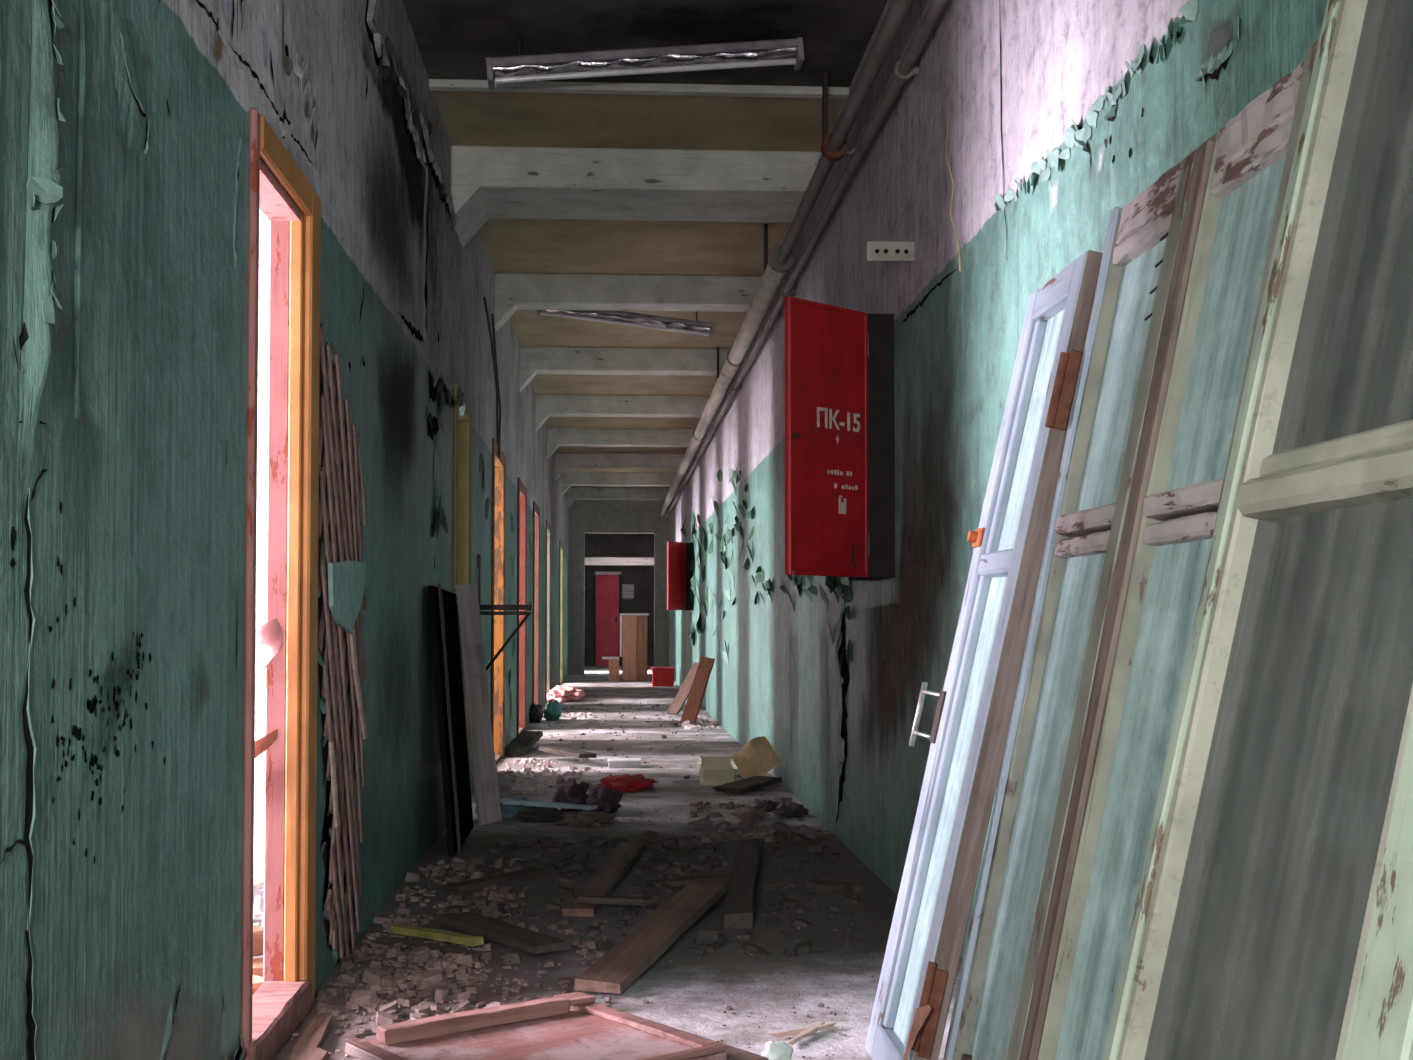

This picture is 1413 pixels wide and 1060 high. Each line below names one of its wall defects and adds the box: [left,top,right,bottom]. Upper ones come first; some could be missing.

crack [233,139,242,268]
crack [196,0,319,188]
crack [349,286,365,372]
water stain [364,51,438,273]
crack [398,165,439,343]
crack [900,267,959,325]
peeling [994,0,1198,211]
peeling [1194,17,1240,87]
crack [0,420,48,1060]
water stain [51,632,166,821]
spalling [317,320,368,963]
crack [828,600,850,823]